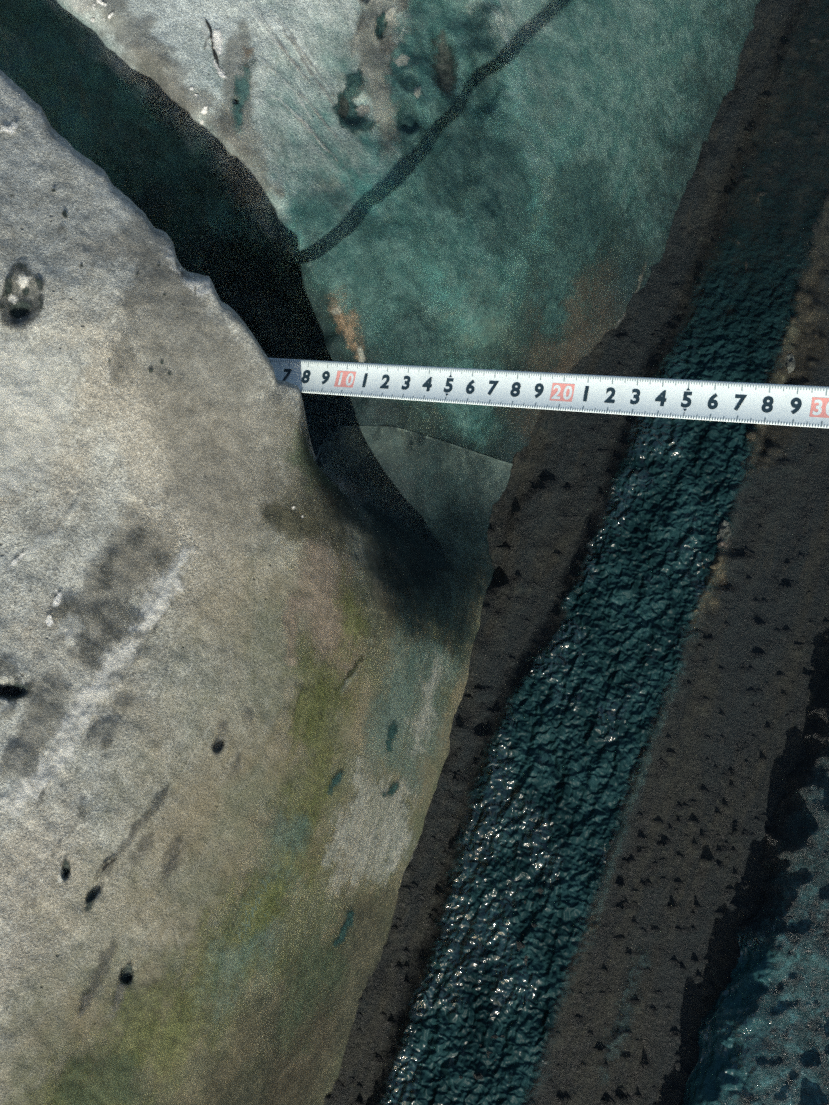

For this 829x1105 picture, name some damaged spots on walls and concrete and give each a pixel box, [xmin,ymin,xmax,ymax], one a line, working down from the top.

crack [204,19,226,78]
spalling [333,70,375,133]
leakage [115,0,760,374]
leakage [121,562,183,659]
spalling [0,660,58,719]
leakage [386,721,398,752]
leakage [205,892,388,1105]